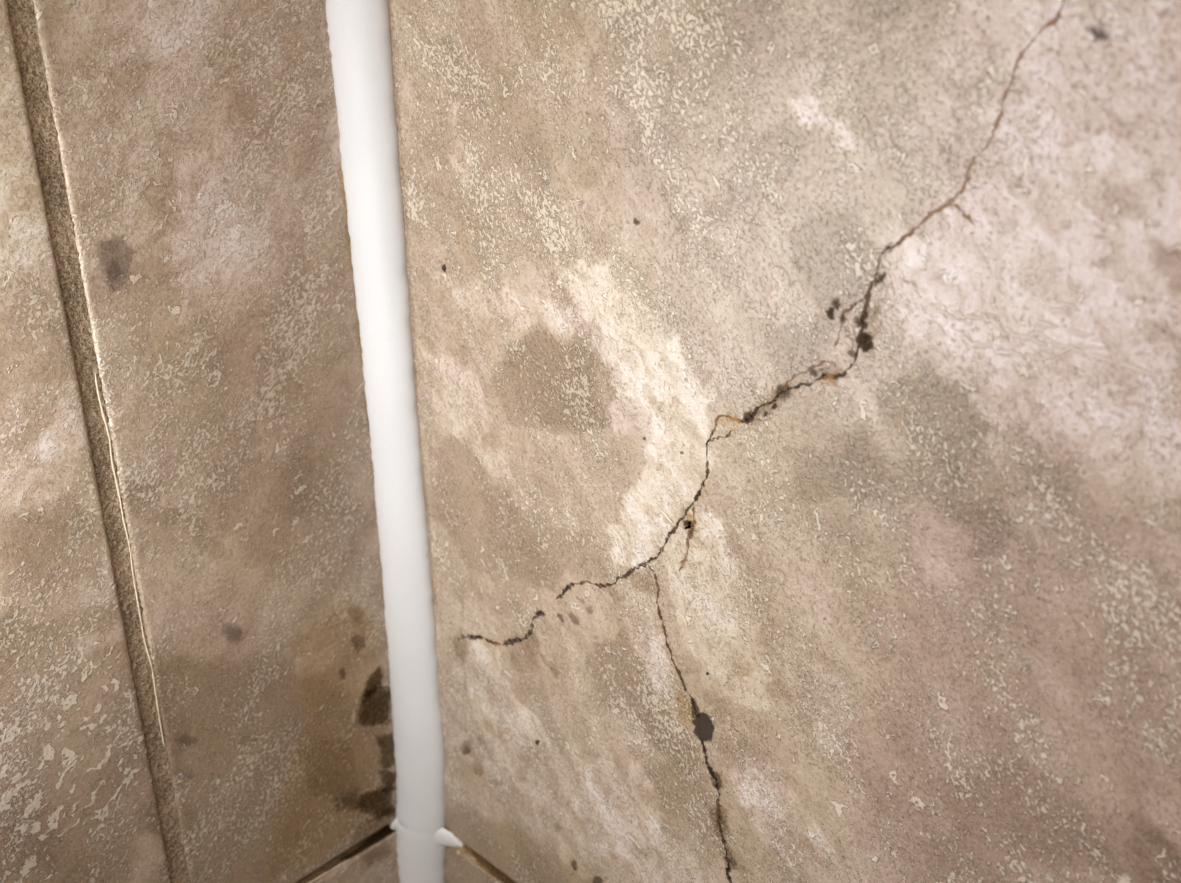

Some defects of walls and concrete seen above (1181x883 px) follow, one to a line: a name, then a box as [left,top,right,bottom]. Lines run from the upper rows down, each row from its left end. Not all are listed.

crack [458,0,1065,883]
damp [358,667,391,726]
damp [340,771,396,859]